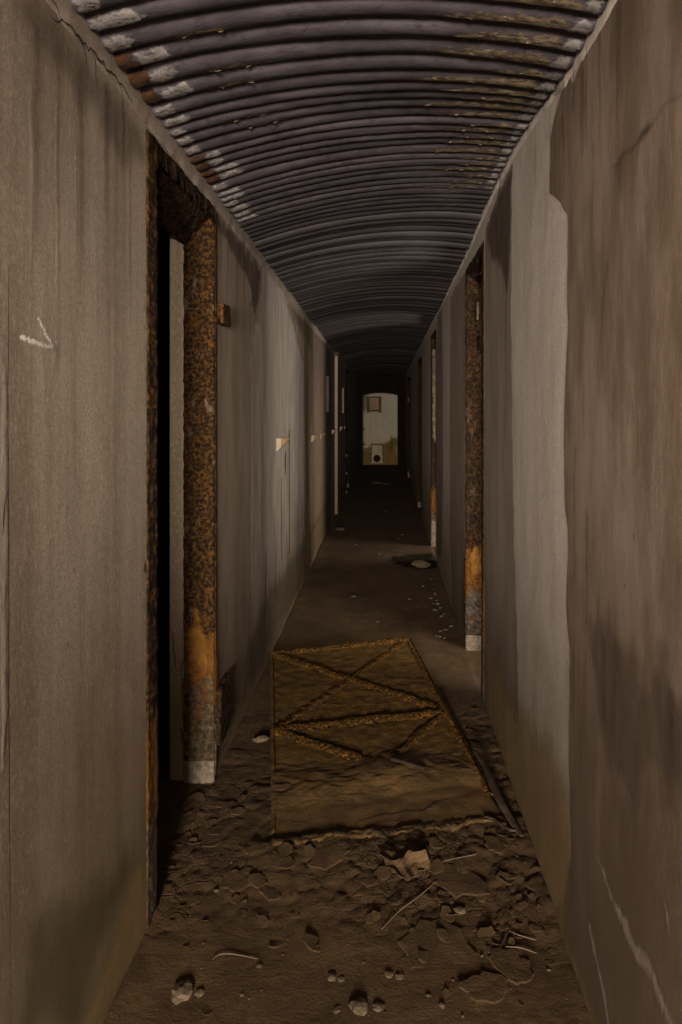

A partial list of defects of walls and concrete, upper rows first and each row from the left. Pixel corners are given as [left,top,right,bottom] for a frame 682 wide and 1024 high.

crack [52,1,135,154]
rust [114,52,164,105]
rust [189,154,221,185]
rust [469,548,480,576]
rust [185,610,219,687]